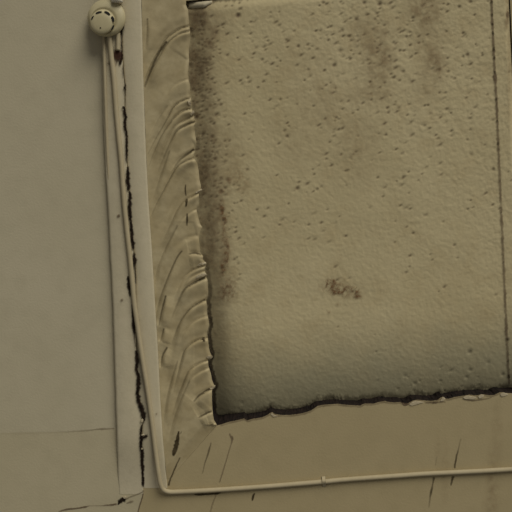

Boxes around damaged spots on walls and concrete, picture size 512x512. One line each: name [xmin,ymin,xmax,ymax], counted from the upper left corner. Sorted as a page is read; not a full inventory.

crack [119,27,148,512]
crack [168,431,179,485]